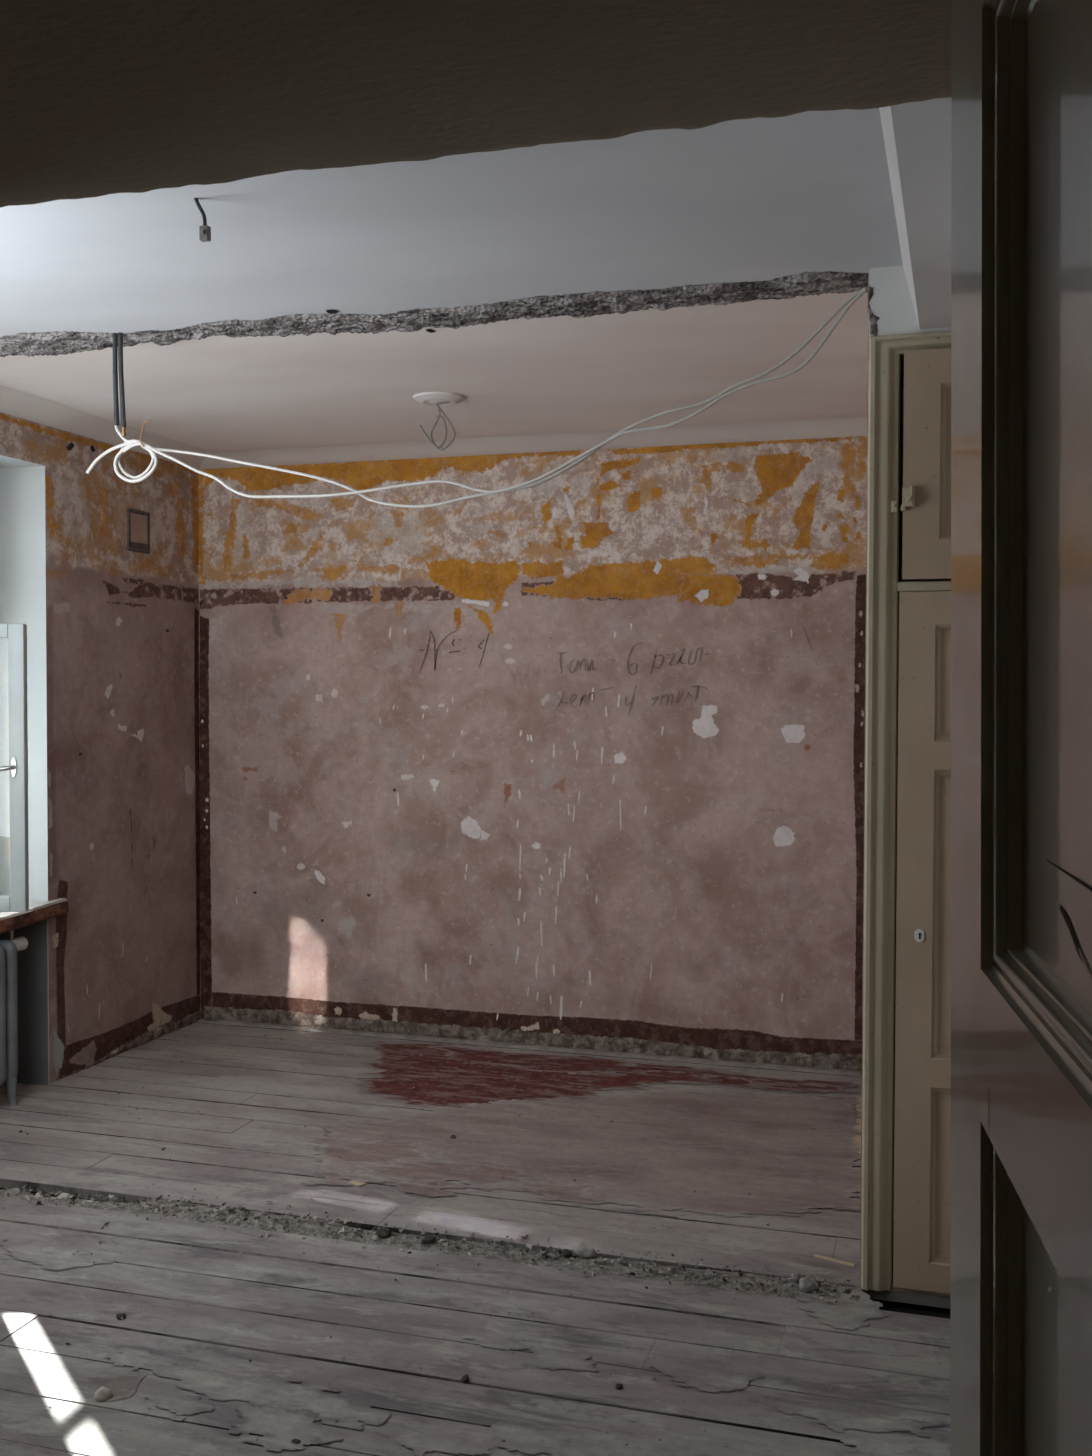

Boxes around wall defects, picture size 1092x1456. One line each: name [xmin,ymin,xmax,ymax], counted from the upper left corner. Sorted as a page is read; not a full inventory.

spalling [0,271,880,357]
peeling [0,412,867,640]